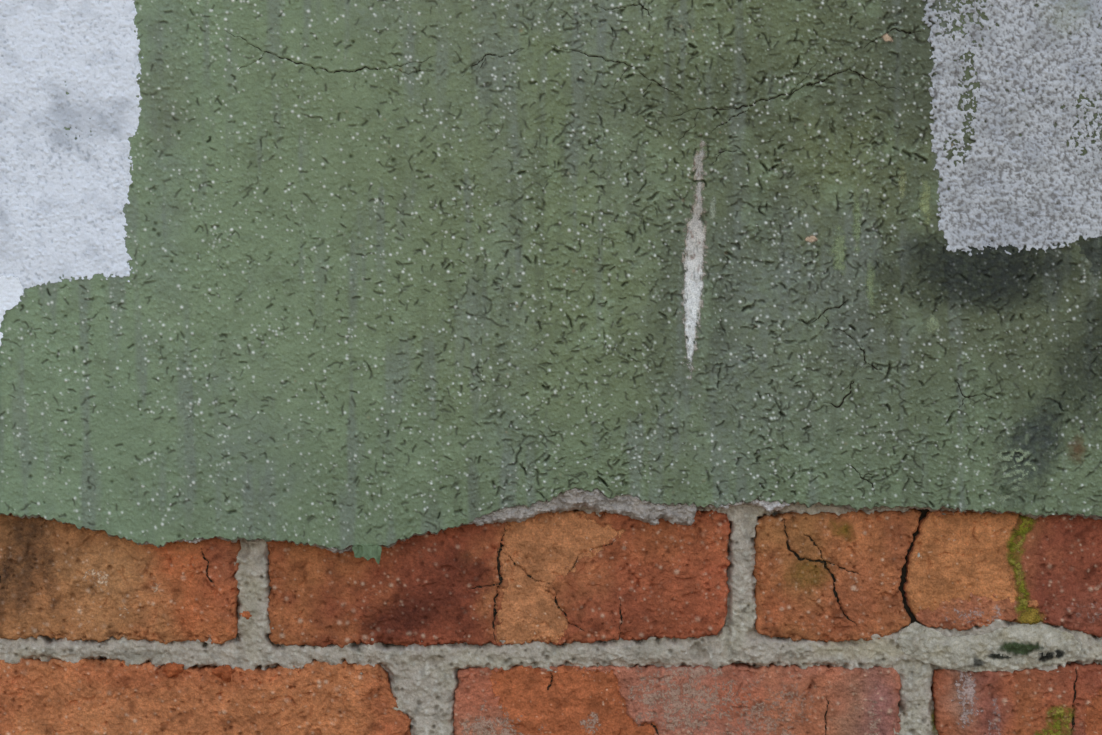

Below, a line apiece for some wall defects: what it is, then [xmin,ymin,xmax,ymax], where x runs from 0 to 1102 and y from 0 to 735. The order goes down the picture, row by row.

crack [229,33,432,74]
peeling [325,544,382,564]
crack [470,528,617,642]
spalling [469,488,791,644]
crack [784,520,859,625]
crack [898,509,929,630]
spalling [905,449,1102,617]
damp [1019,609,1039,625]
spalling [487,665,658,735]